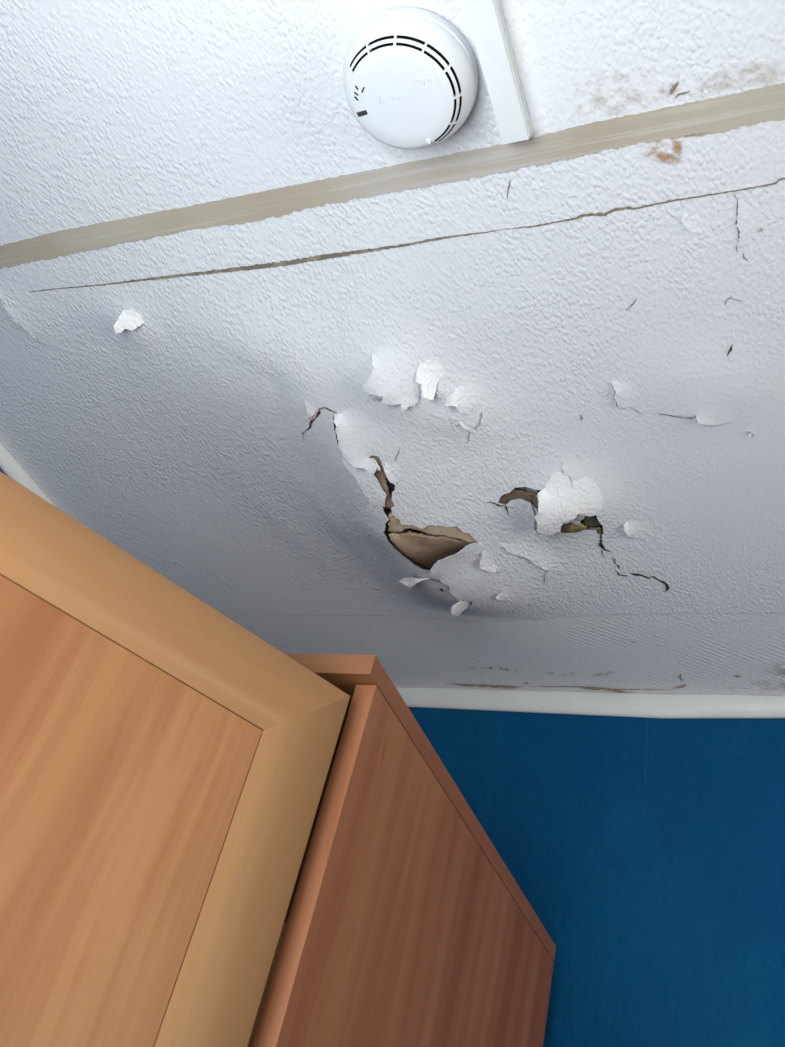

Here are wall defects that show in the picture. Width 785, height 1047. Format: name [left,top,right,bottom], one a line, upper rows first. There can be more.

crack [733,193,749,262]
peeling [0,281,75,356]
peeling [113,309,144,334]
peeling [304,400,316,419]
peeling [363,339,485,431]
peeling [610,378,642,409]
peeling [657,387,737,425]
peeling [333,408,405,532]
peeling [398,455,603,616]
crack [599,535,669,592]
peeling [623,520,654,540]